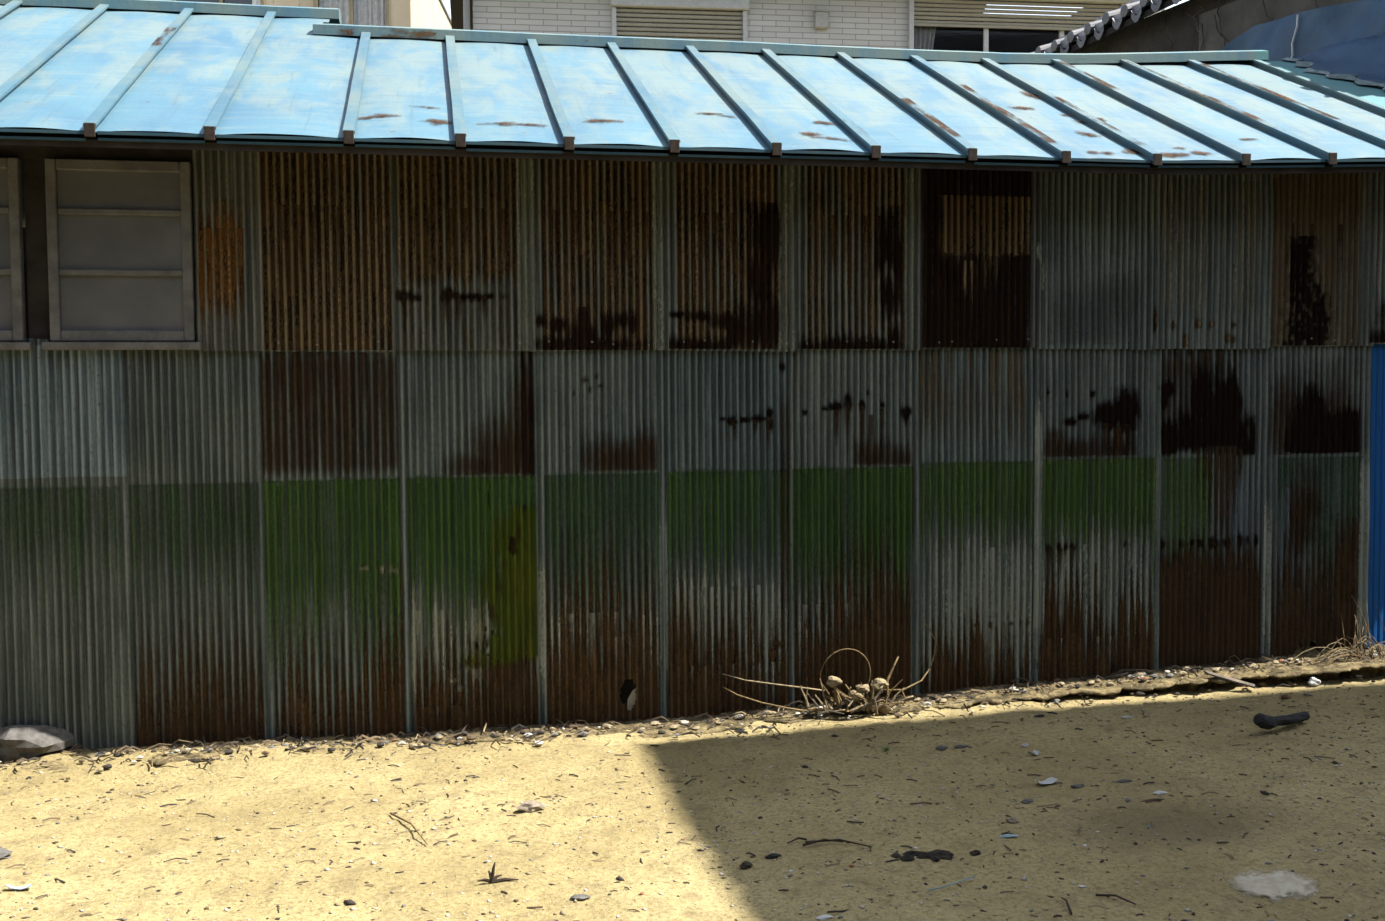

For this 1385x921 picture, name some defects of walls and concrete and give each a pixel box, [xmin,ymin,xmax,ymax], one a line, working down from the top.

corrosion [136,152,1364,747]
corrosion [1270,173,1385,346]